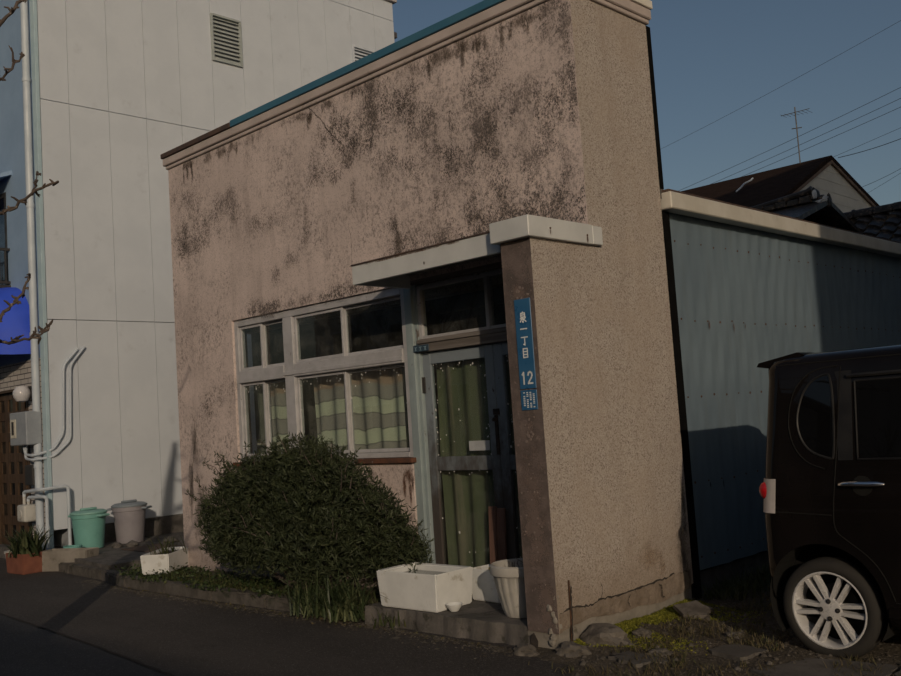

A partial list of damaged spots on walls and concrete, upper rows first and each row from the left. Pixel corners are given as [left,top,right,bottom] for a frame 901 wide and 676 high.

water stain [295,0,585,254]